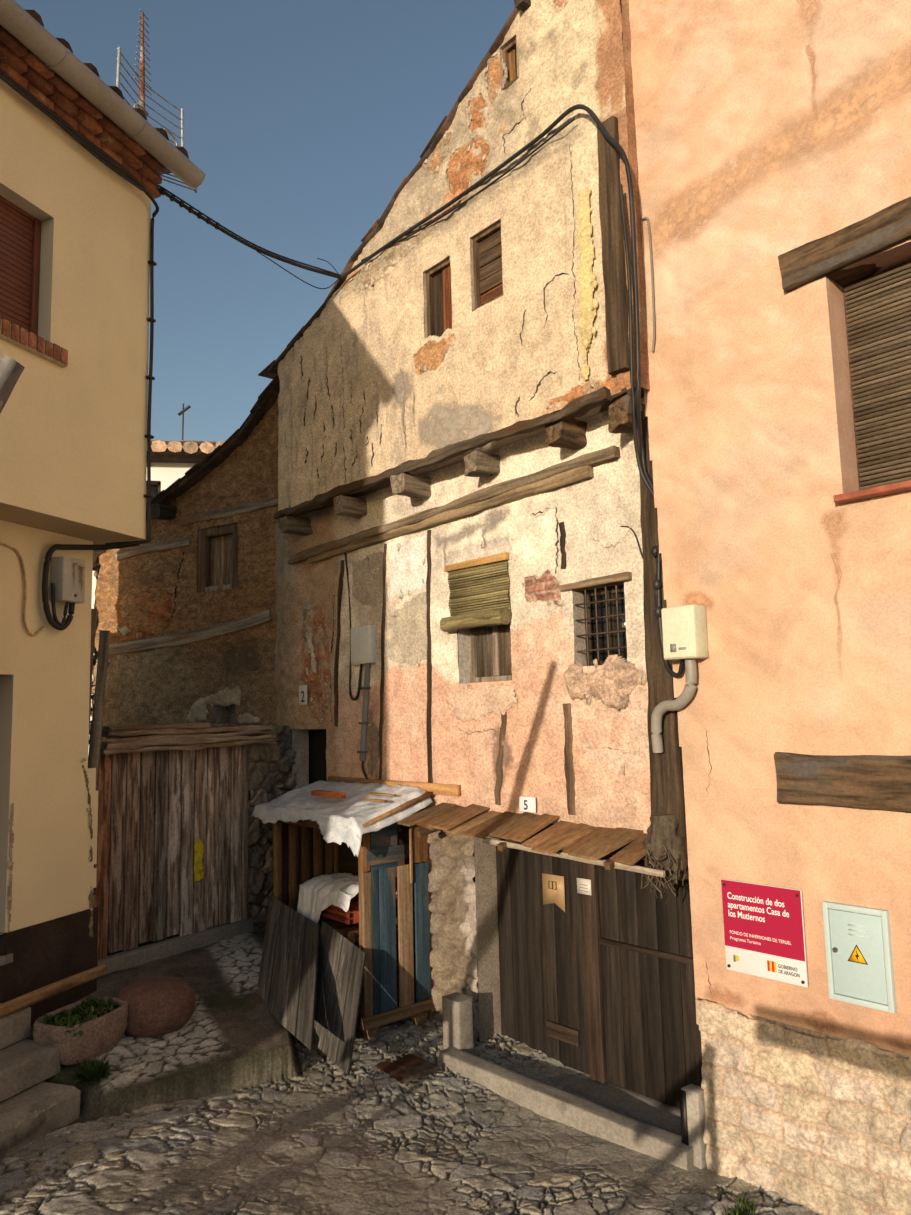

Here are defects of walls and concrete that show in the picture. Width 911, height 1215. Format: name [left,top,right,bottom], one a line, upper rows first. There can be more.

spalling [550,0,569,13]
spalling [422,51,508,207]
crack [514,138,581,416]
spalling [410,328,460,381]
flaking render [350,532,564,671]